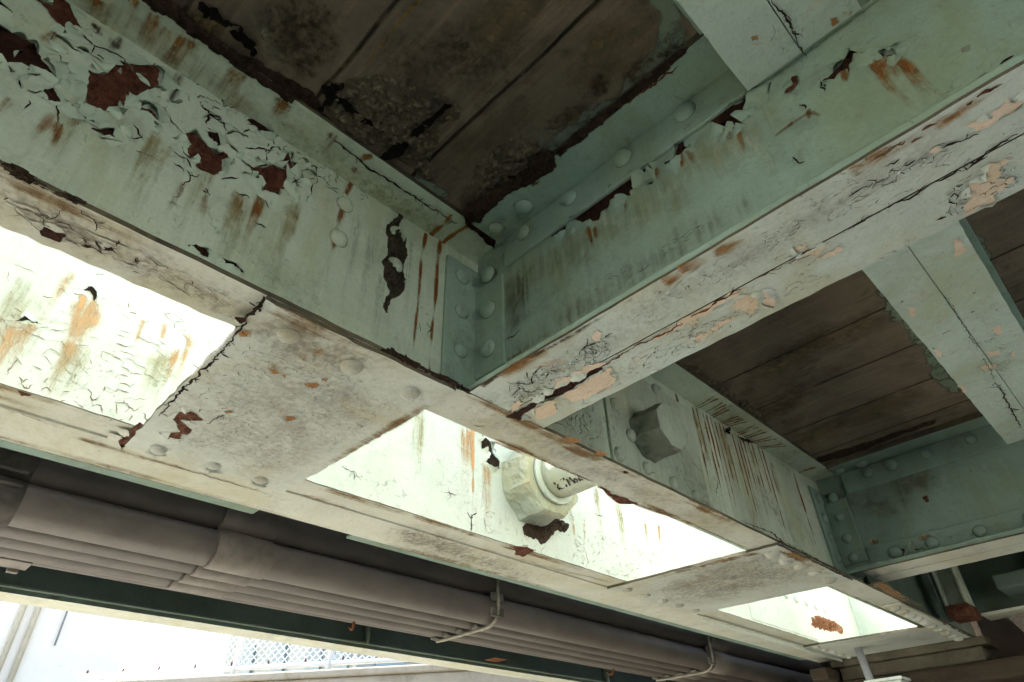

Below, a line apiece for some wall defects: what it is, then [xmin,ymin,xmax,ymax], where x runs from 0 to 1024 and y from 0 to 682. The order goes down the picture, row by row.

crack [771,0,807,61]
corrosion [870,57,919,89]
peeling [0,0,304,212]
peeling [959,159,1014,215]
corrosion [63,295,100,362]
crack [0,197,386,498]
peeling [654,288,776,344]
crack [932,292,1021,428]
peeling [505,362,618,421]
corrosion [487,404,607,459]
corrosion [692,396,785,527]
corrosion [522,519,585,560]